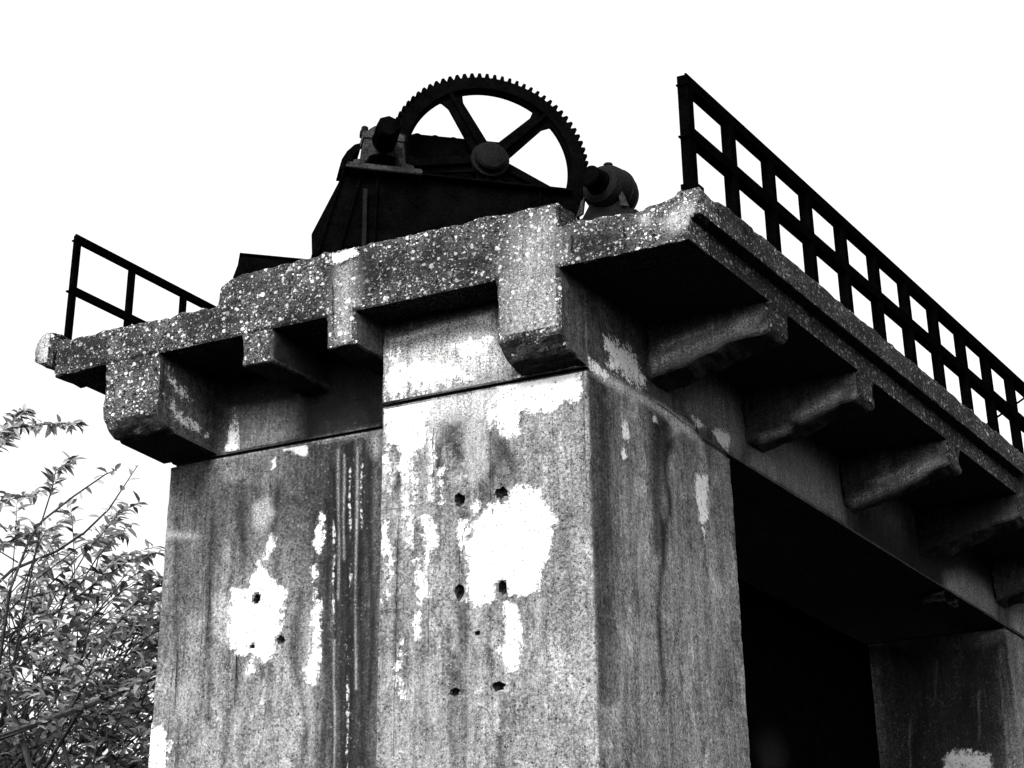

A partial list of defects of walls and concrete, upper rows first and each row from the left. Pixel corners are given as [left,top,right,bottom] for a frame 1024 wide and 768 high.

peeling [486,366,583,439]
peeling [226,533,288,677]
leakage [223,313,506,768]
peeling [454,484,558,692]
leakage [588,332,730,659]
peeling [694,472,709,539]
peeling [943,749,991,768]